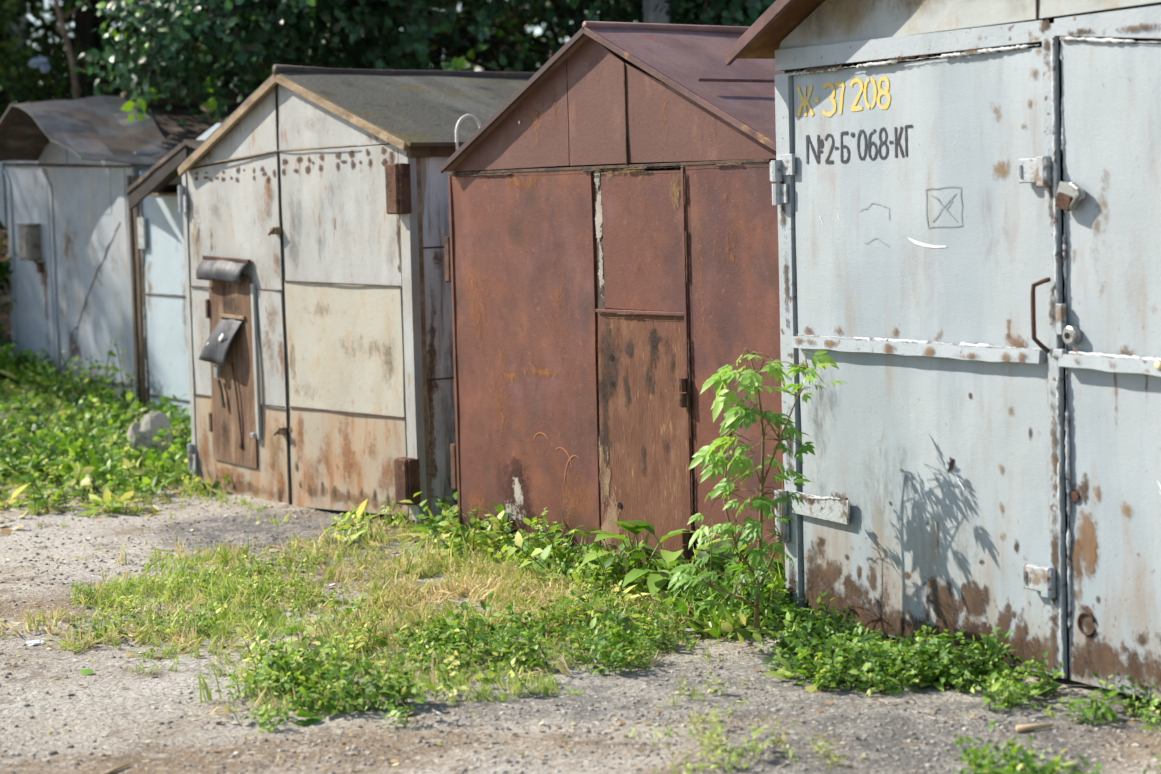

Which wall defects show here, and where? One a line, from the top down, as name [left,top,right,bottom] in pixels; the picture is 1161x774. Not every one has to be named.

rust [797,64,842,73]
rust [1039,18,1050,67]
rust [1115,24,1161,32]
rust [195,135,394,217]
rust [780,206,843,348]
rust [1001,319,1028,362]
rust [199,417,401,509]
peeling [503,476,526,522]
rust [1047,379,1058,497]
rust [788,514,1161,690]